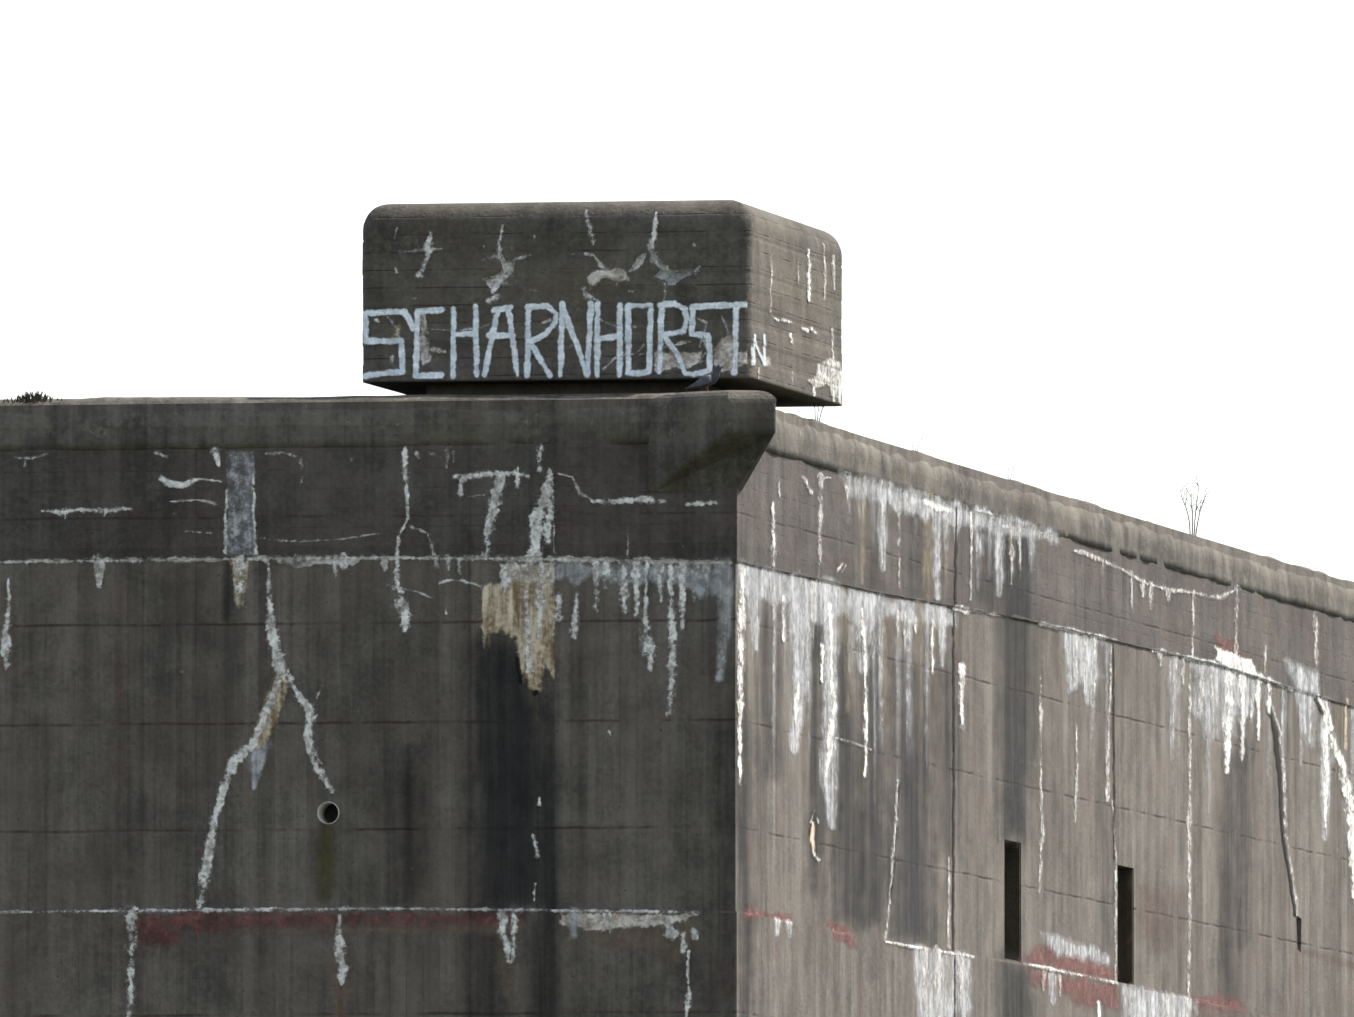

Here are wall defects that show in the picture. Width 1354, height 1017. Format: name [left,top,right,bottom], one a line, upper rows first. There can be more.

crack [196,446,717,909]
peeling [482,562,557,696]
leakage [476,645,699,1017]
leakage [740,798,751,960]
leakage [554,473,1117,918]
leakage [886,671,973,1017]
leakage [1114,848,1192,1017]
leakage [1152,590,1328,927]
crack [1269,707,1299,916]
crack [1313,694,1354,899]